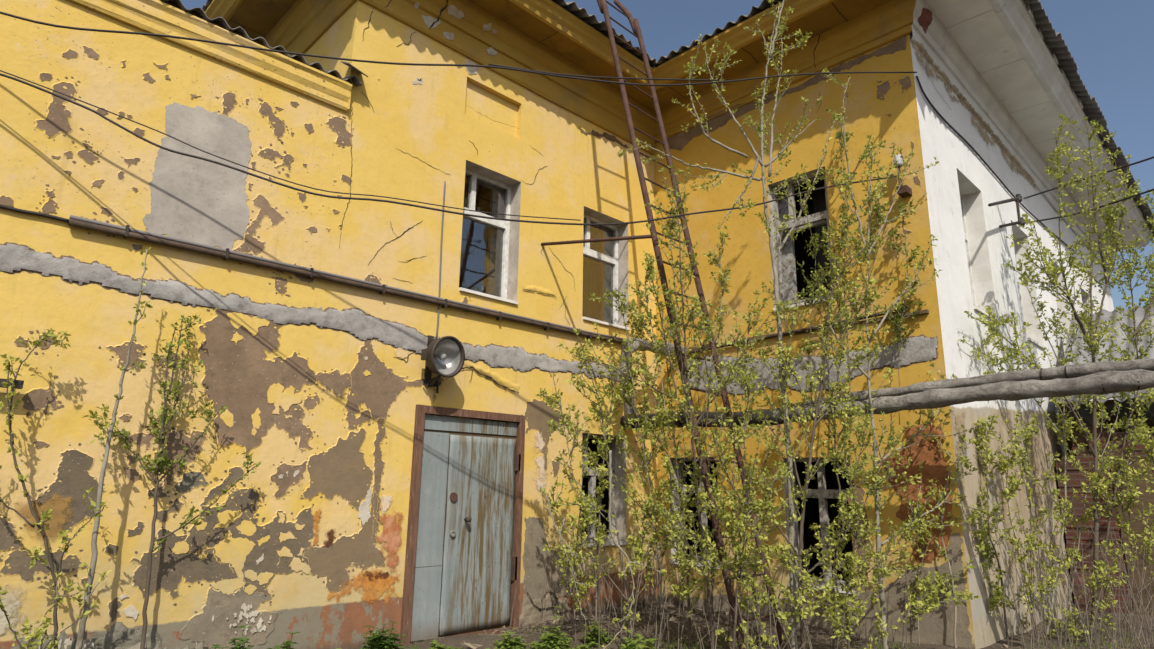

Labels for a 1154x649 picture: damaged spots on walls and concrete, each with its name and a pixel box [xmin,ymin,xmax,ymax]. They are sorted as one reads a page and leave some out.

peeling [36,184,59,214]
peeling [28,72,102,177]
peeling [61,45,100,60]
peeling [73,206,115,237]
peeling [91,156,141,193]
peeling [142,62,171,84]
peeling [216,91,354,297]
crack [339,94,374,248]
crack [368,220,425,282]
spalling [667,8,1036,188]
peeling [0,308,444,649]
spalling [882,424,952,563]